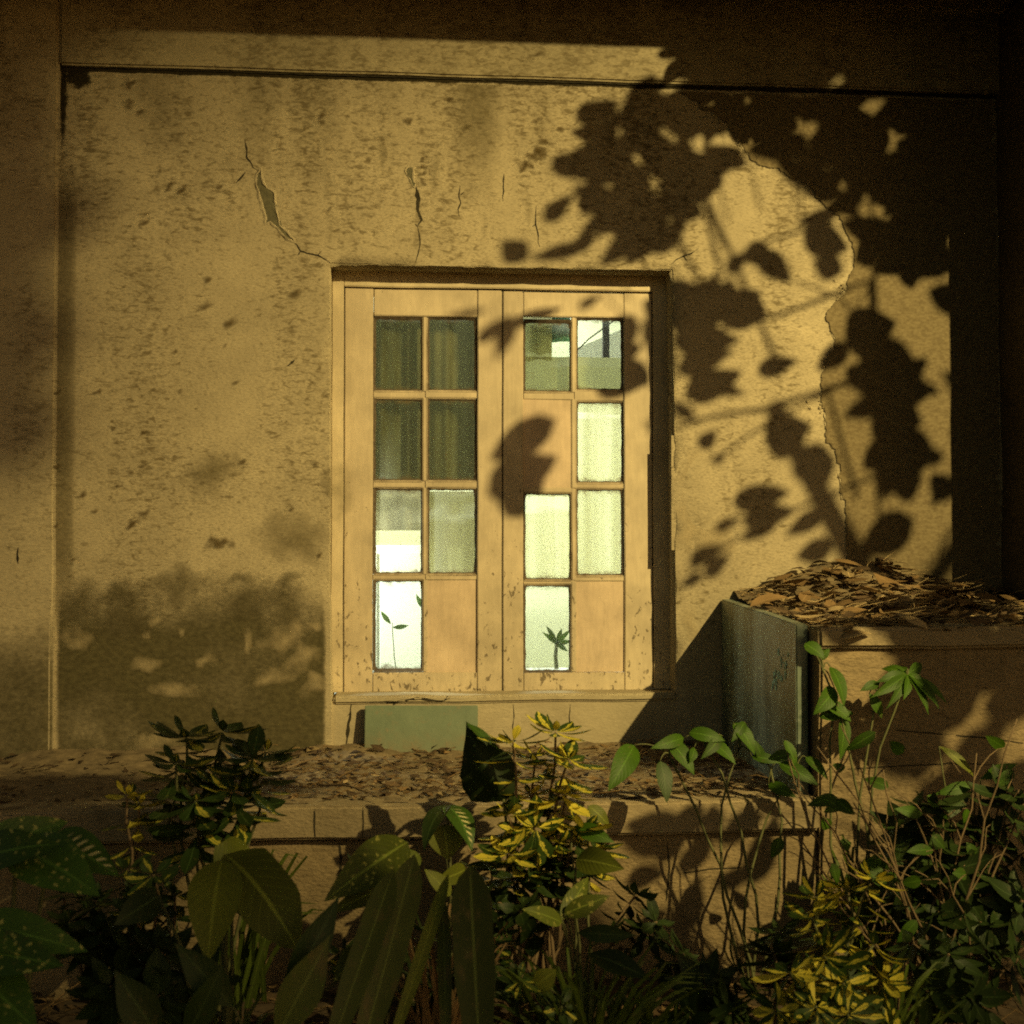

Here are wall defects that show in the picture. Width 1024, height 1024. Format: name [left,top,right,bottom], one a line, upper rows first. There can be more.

crack [236,142,257,183]
crack [415,187,423,260]
crack [295,243,330,263]